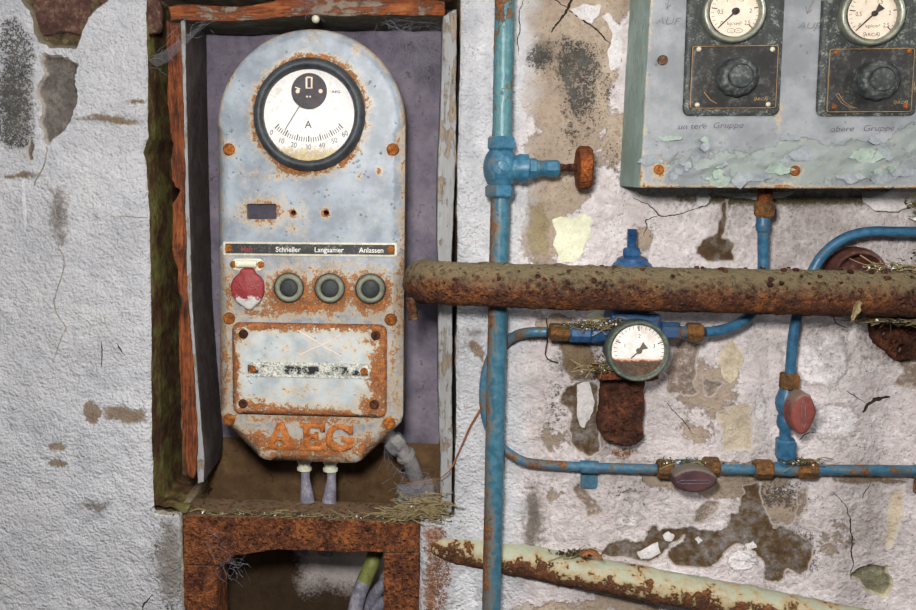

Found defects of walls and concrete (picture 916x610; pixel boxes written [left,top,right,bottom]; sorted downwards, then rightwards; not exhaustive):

spalling [147,0,163,36]
crack [551,0,611,44]
leakage [0,17,36,149]
spalling [21,0,108,164]
leakage [526,35,602,115]
crack [33,147,66,360]
peeling [552,214,591,263]
crack [847,391,890,413]
peeling [594,480,814,584]